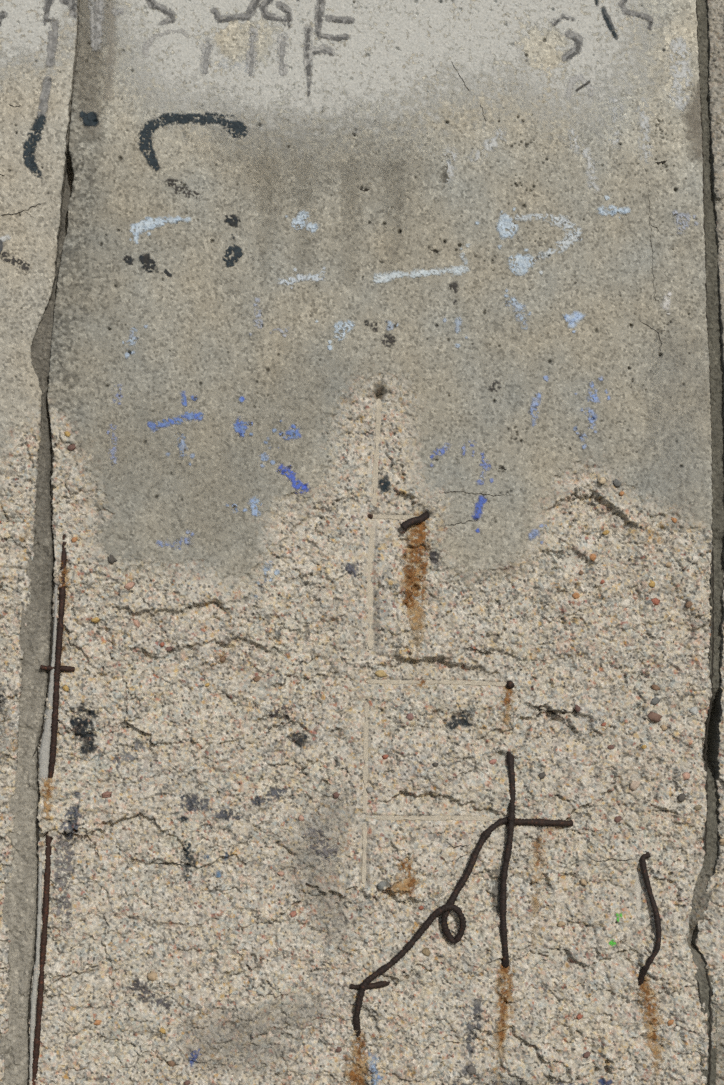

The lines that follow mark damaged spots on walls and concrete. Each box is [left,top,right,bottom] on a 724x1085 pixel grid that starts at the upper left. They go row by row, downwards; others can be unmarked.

crack [696,0,715,856]
corrosion [401,514,430,667]
crack [28,399,56,1085]
corrosion [41,777,55,819]
spalling [0,371,724,1085]
corrosion [387,861,418,896]
corrosion [345,1033,367,1085]
corrosion [494,958,514,1056]
corrosion [639,977,663,1084]
crack [705,970,713,1085]